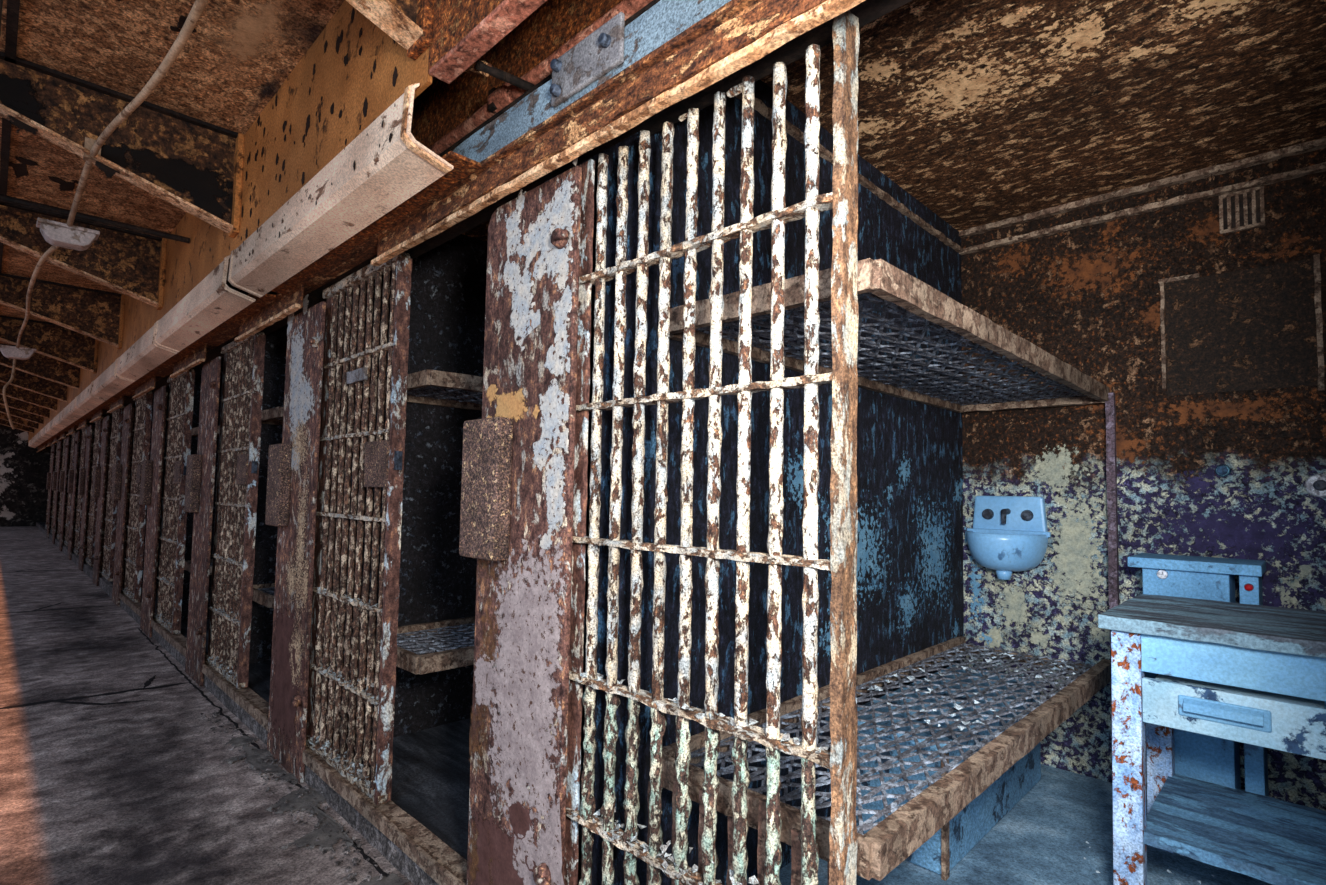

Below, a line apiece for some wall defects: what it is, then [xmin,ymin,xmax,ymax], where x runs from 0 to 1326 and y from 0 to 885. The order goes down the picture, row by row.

peeling [474,157,766,885]
peeling [784,447,832,589]
rust [271,605,305,749]
peeling [818,608,831,665]